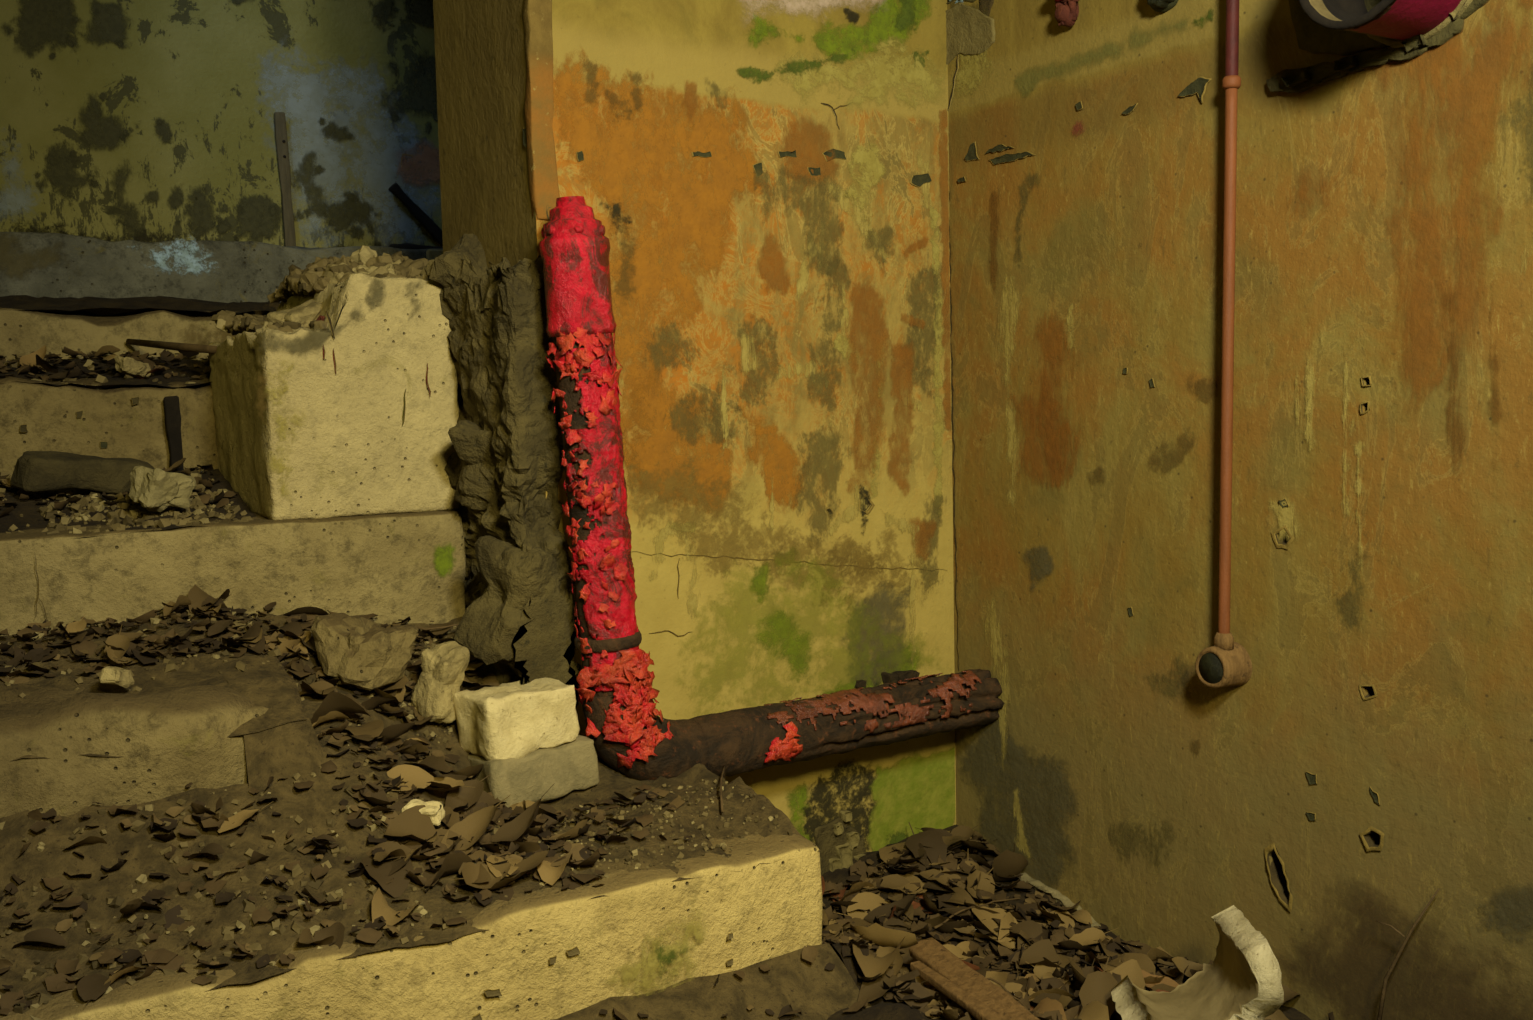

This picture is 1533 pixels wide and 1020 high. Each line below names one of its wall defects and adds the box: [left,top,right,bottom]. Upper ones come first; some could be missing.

damp [749,0,877,12]
flaking render [945,0,996,95]
damp [15,223,173,242]